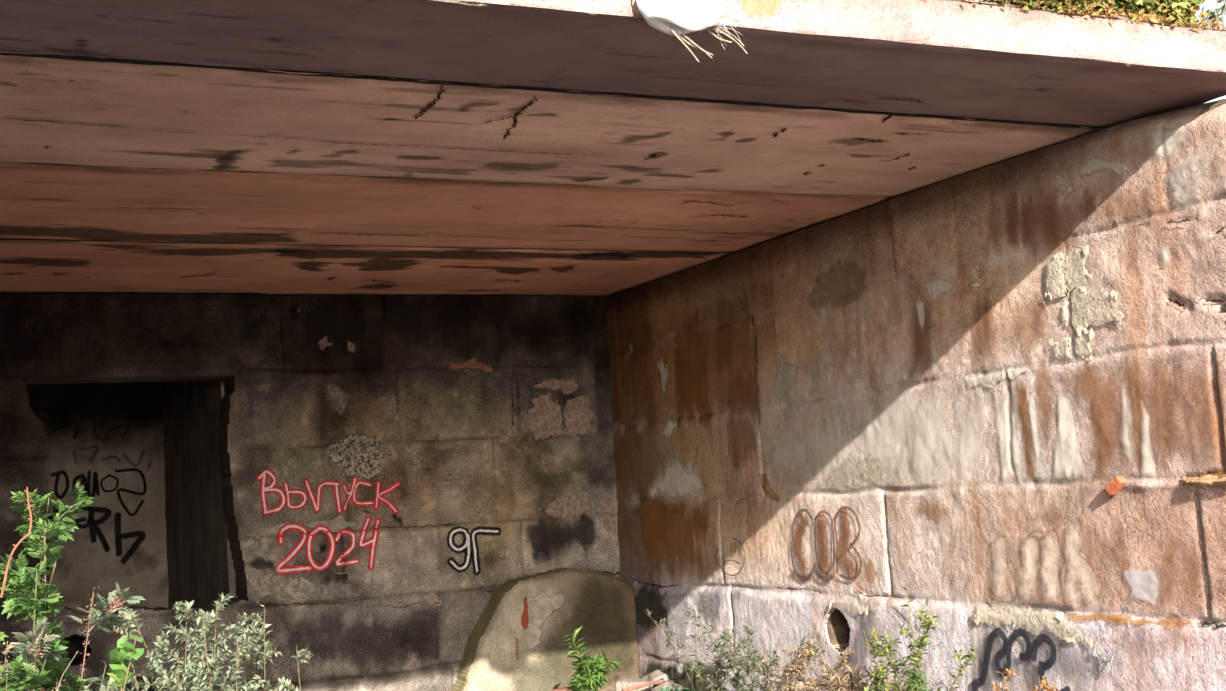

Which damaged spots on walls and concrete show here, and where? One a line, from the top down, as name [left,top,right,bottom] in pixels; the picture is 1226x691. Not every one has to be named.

crack [0,118,187,149]
crack [228,84,611,157]
spalling [528,379,594,440]